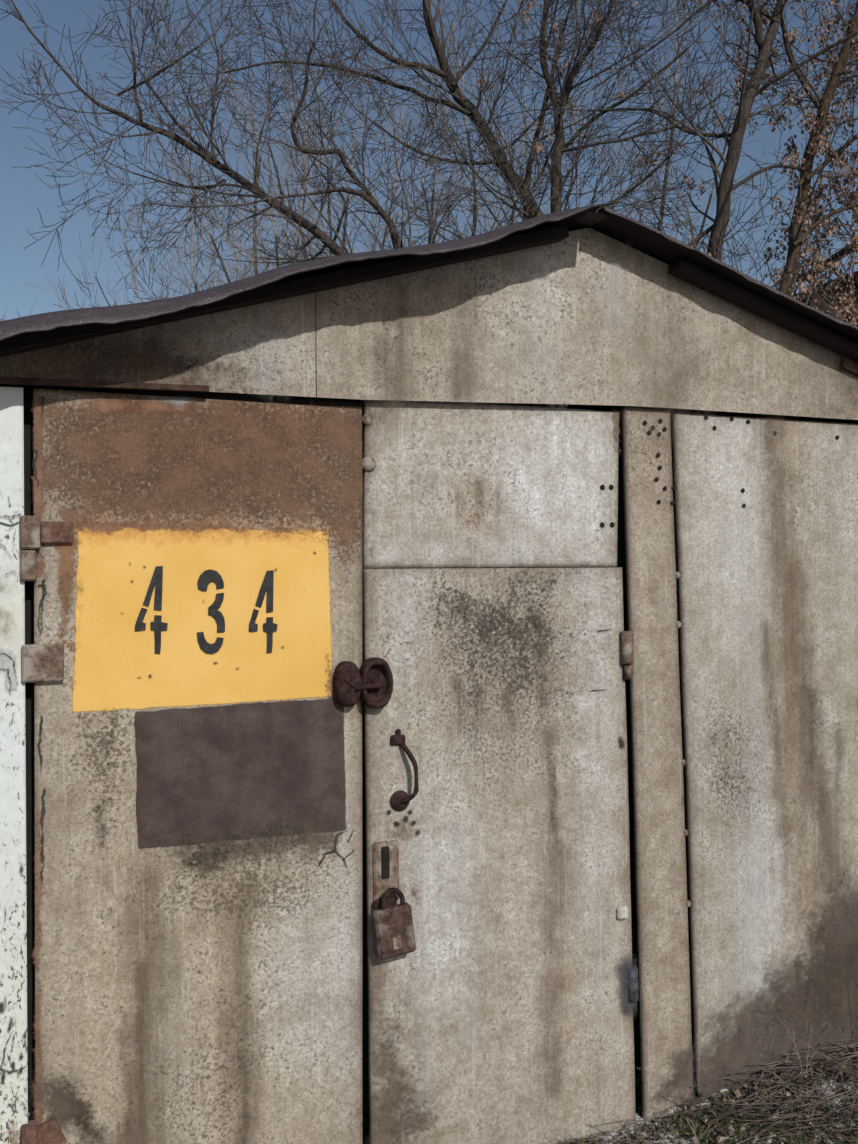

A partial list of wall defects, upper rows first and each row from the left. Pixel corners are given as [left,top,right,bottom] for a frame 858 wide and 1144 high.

rust [32,392,373,649]
leakage [423,556,583,713]
crack [317,829,354,869]